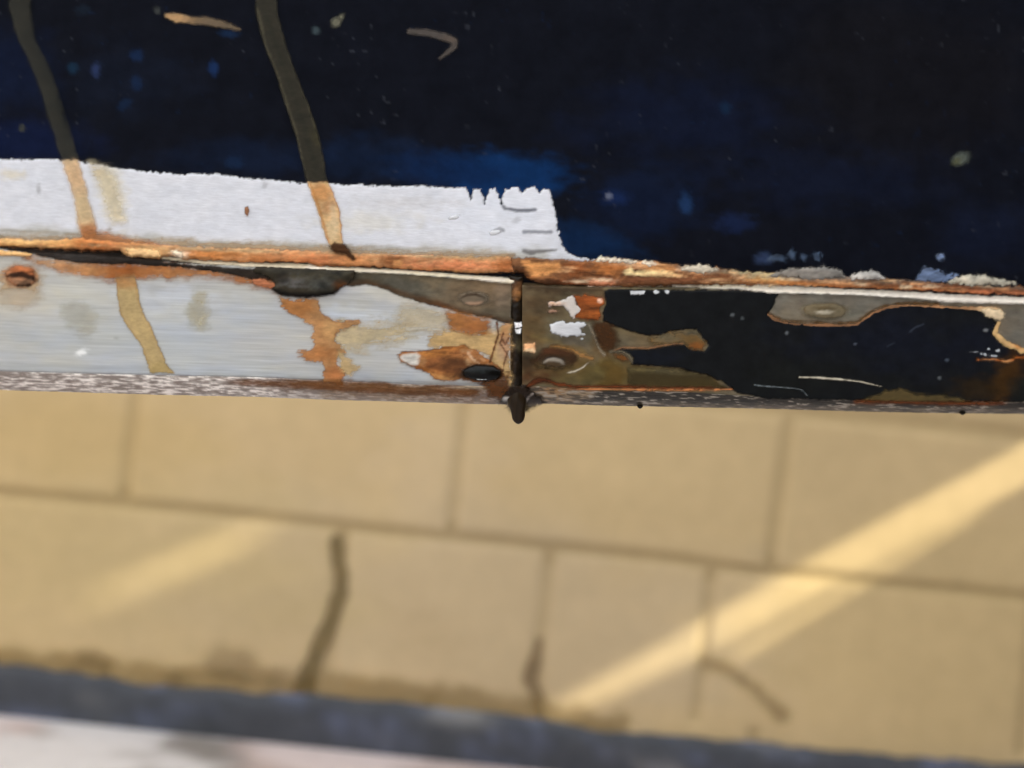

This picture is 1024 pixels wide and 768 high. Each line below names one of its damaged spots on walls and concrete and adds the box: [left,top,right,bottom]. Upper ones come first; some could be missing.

water stain [9,0,155,244]
water stain [255,0,356,260]
corrosion [0,235,332,373]
peeling [347,272,522,334]
corrosion [235,294,734,399]
peeling [767,302,1024,362]
crack [294,536,348,693]